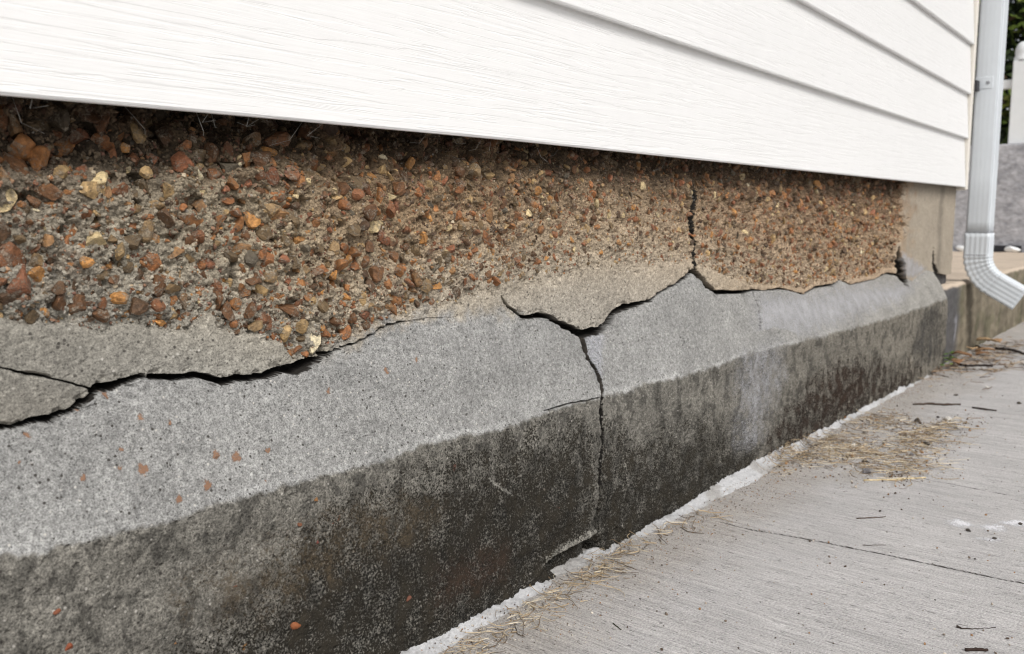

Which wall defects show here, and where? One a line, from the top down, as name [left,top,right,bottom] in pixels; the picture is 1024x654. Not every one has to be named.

spalling [0,96,907,360]
crack [0,320,406,429]